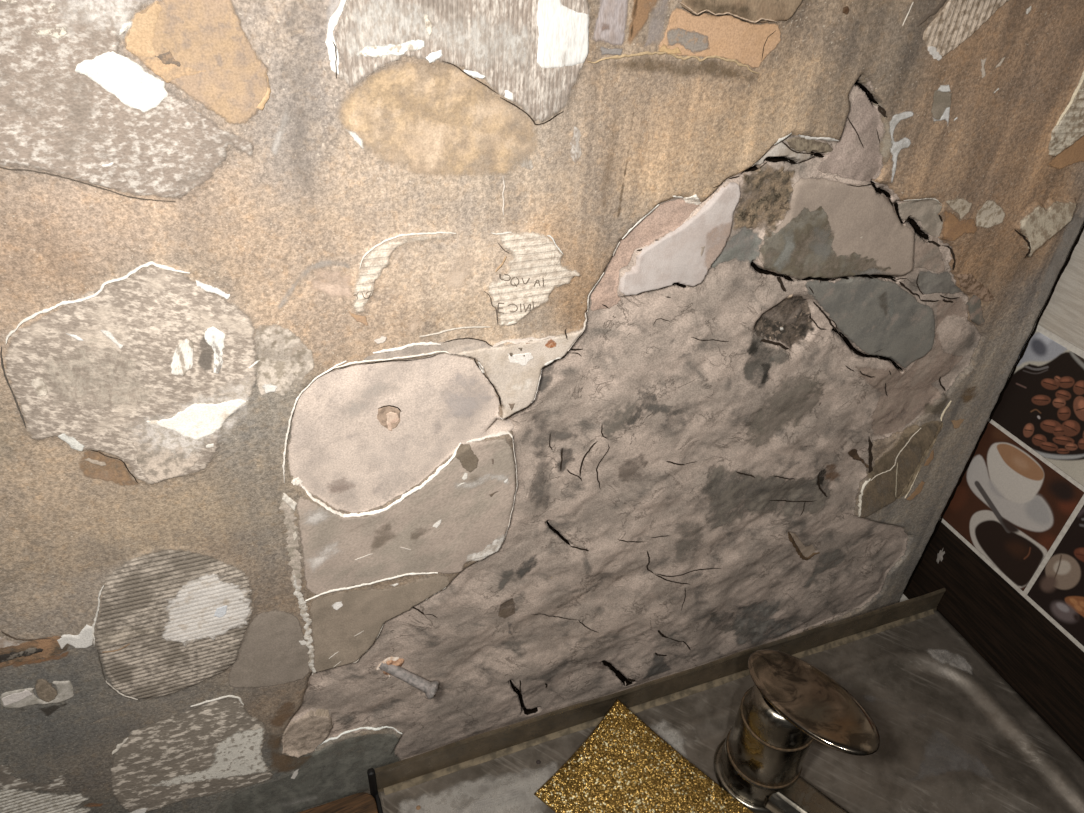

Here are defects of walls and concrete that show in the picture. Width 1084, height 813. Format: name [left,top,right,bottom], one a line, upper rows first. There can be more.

peeling [356,13,442,63]
peeling [659,0,803,68]
peeling [75,51,168,112]
peeling [171,327,225,376]
peeling [133,399,248,483]
crack [549,426,610,490]
flaking render [272,77,1005,779]
crack [866,437,874,473]
crack [546,521,589,551]
crack [618,535,720,610]
crack [510,680,548,715]
crack [593,660,635,686]